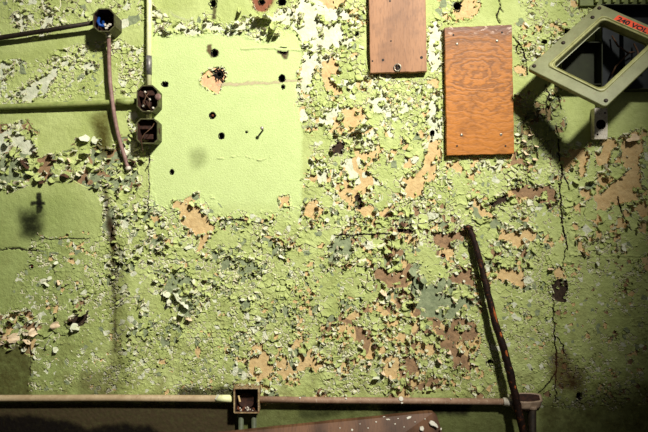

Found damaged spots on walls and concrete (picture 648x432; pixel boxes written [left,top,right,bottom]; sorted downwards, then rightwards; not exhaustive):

peeling [512,0,595,79]
crack [3,237,89,252]
peeling [0,0,511,398]
peeling [456,86,648,414]
crack [555,129,569,269]
crack [539,304,566,402]